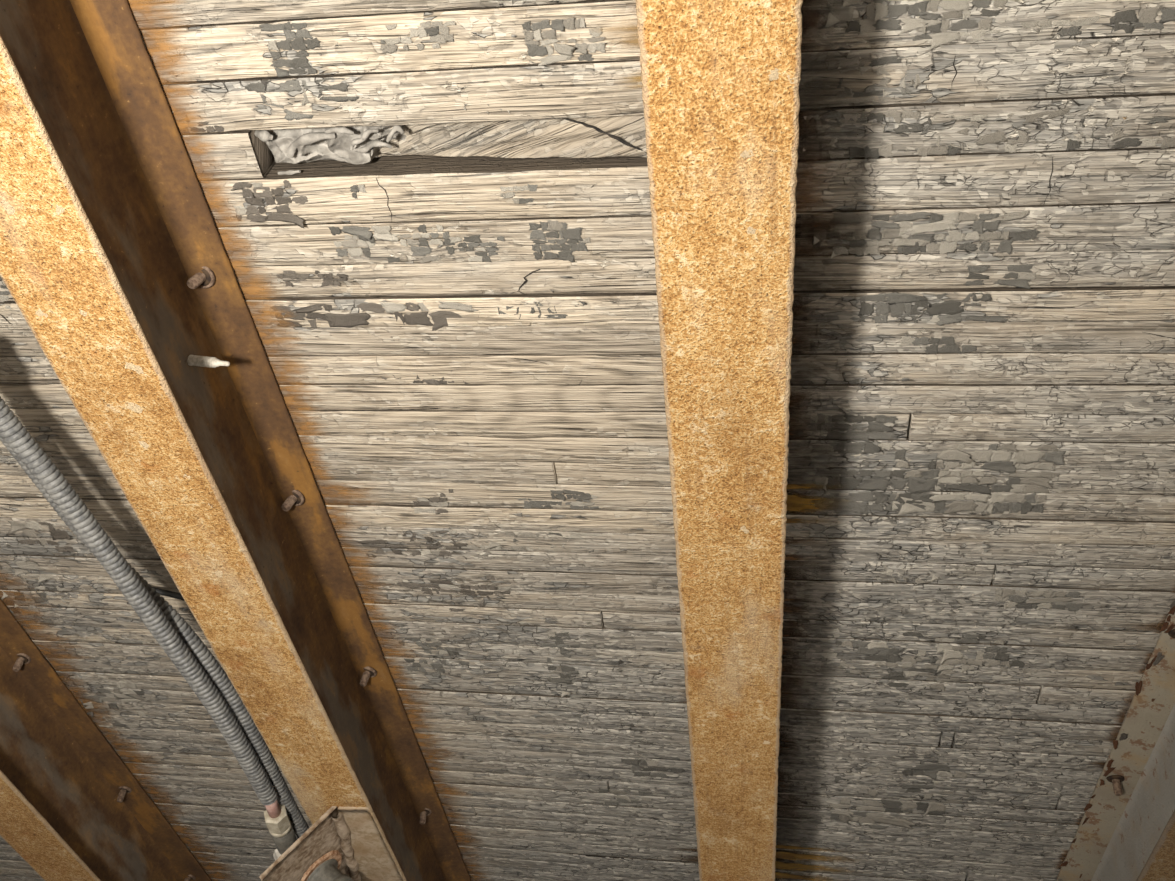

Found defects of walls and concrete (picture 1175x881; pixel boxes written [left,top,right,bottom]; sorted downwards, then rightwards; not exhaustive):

peeling [803,0,1175,160]
crack [515,78,647,154]
peeling [231,180,308,228]
peeling [350,184,367,199]
peeling [812,210,1041,354]
peeling [809,414,1066,515]
peeling [880,564,1083,611]
rust [1143,614,1168,633]
peeling [822,632,1038,691]
rust [1110,693,1135,741]
peeling [829,763,967,830]
peeling [1082,733,1128,825]